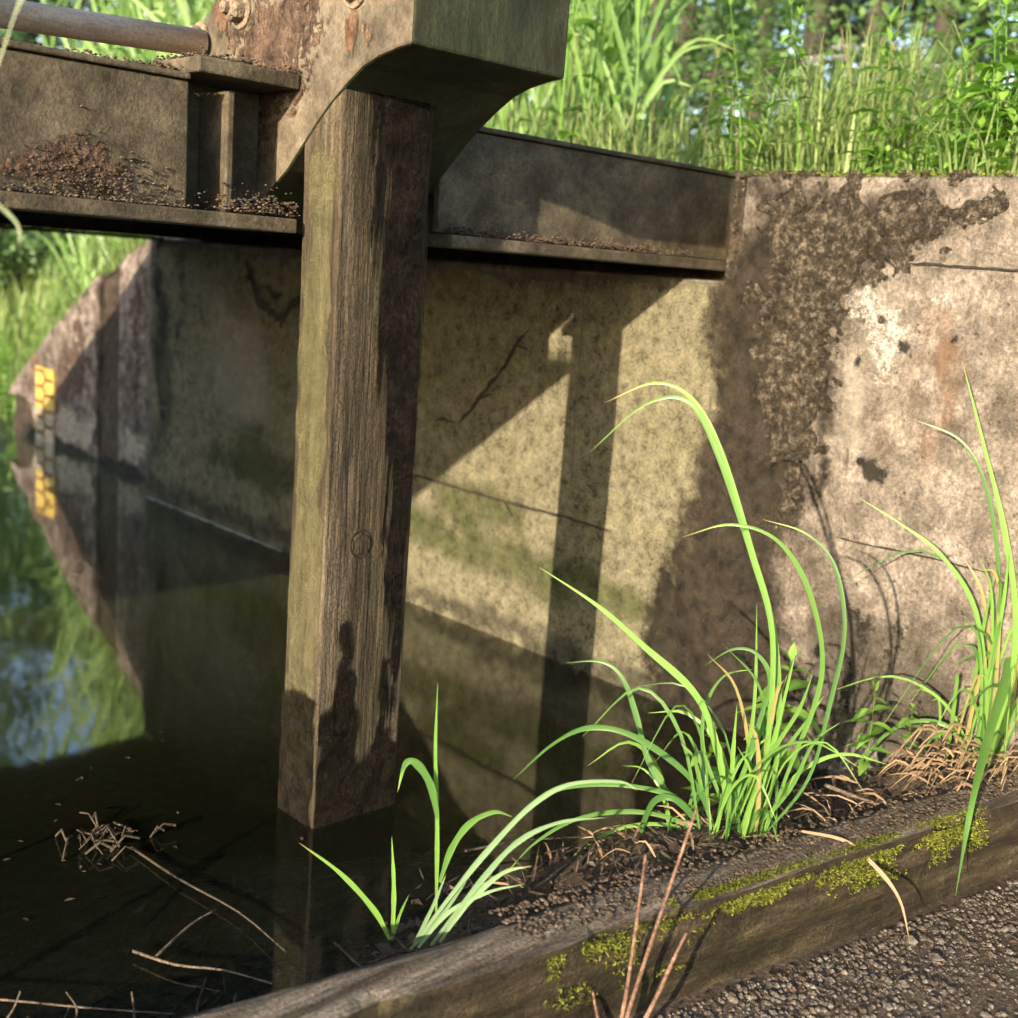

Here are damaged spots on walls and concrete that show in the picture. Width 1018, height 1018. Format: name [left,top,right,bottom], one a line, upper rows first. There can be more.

corrosion [344,8,371,54]
crack [434,330,529,424]
water stain [800,181,934,444]
spalling [725,170,1010,512]
crack [413,474,610,532]
water stain [441,177,851,780]
crack [837,537,988,573]
water stain [814,609,943,744]